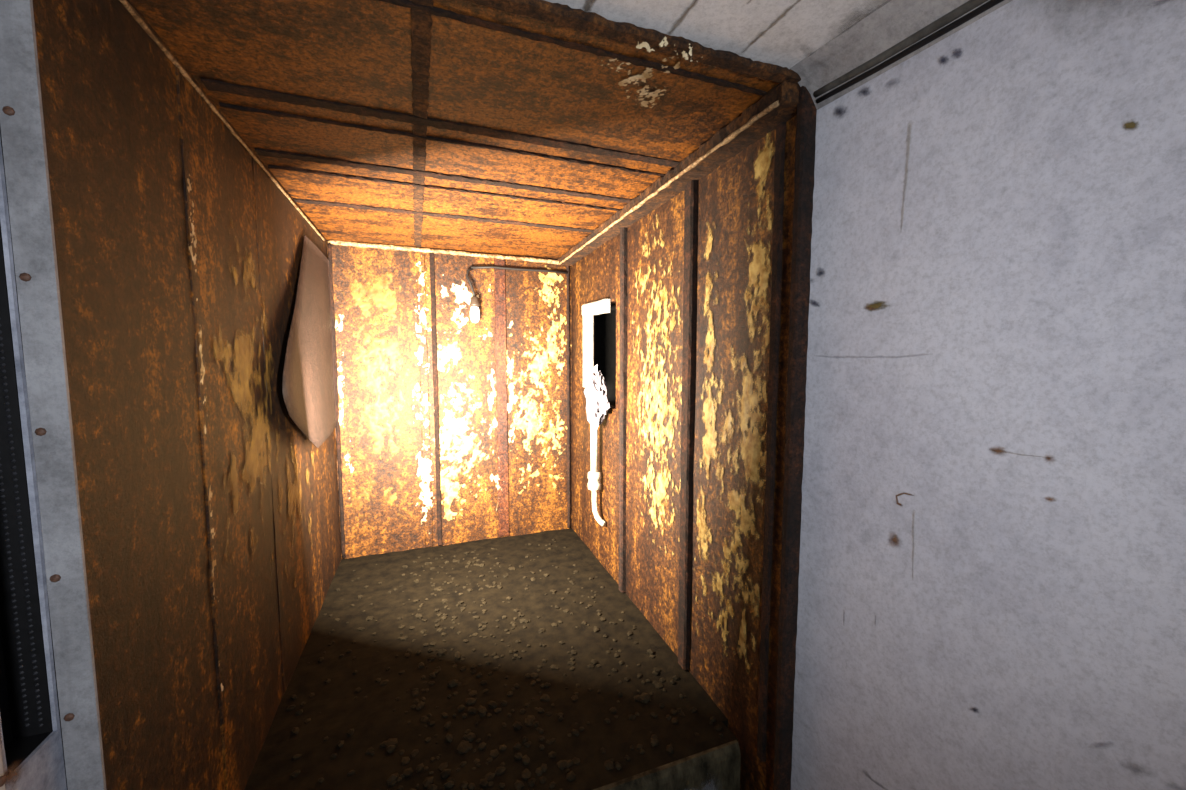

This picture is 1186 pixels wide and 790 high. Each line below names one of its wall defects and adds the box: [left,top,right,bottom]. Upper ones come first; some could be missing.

peeling [601,36,698,108]
peeling [335,260,567,522]
peeling [632,220,683,555]
peeling [694,133,773,673]